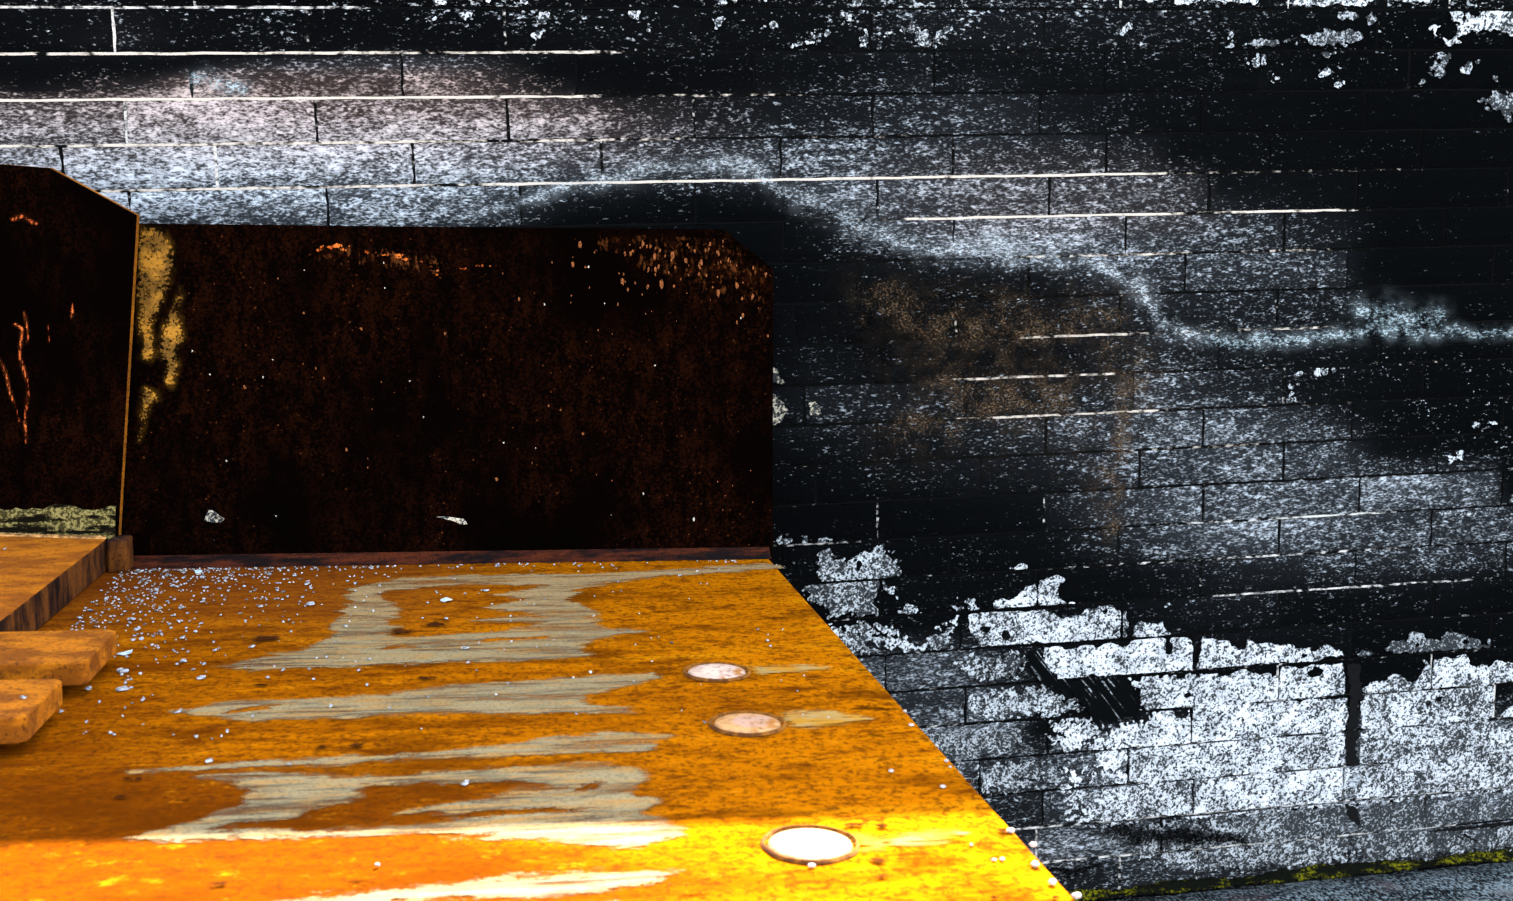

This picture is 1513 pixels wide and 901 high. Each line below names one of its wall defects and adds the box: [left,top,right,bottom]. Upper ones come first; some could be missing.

peeling [1145,0,1258,16]
peeling [1225,0,1377,88]
peeling [1394,0,1513,85]
peeling [1477,75,1513,123]
rust [571,238,767,341]
water stain [707,160,1513,348]
rust [6,323,29,443]
peeling [1286,368,1344,403]
peeling [1448,450,1464,465]
peeling [773,533,1513,877]
water stain [1344,663,1364,766]
water stain [1345,803,1361,829]